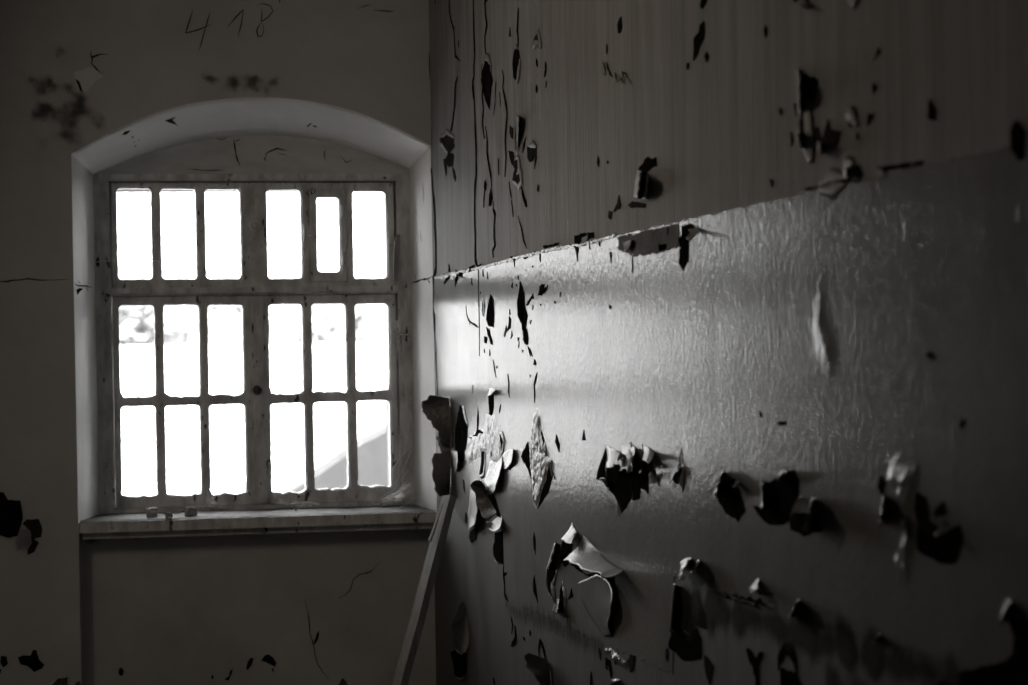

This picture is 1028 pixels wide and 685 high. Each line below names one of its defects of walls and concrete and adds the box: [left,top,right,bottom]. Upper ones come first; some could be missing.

peeling [481,53,493,110]
peeling [509,28,521,84]
peeling [439,128,456,182]
peeling [508,115,537,191]
peeling [608,157,657,219]
peeling [779,68,874,200]
peeling [421,223,699,565]
peeling [714,470,823,536]
peeling [533,523,623,637]
peeling [665,558,713,685]
peeling [524,653,550,685]
peeling [605,654,635,685]